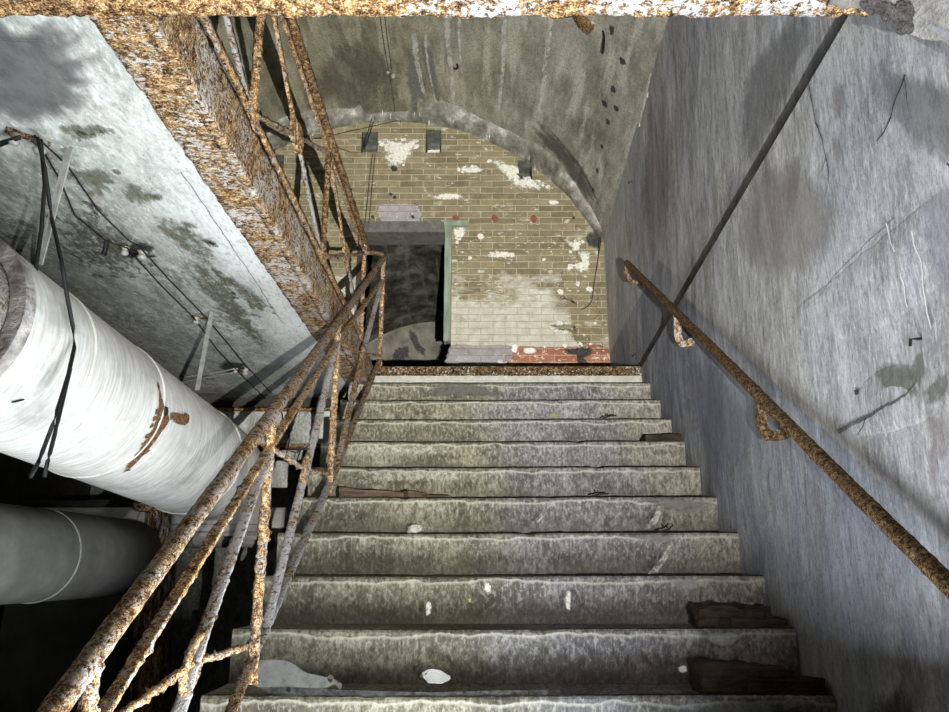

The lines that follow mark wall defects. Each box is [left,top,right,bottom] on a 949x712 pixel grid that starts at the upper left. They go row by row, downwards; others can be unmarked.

spalling [859,0,915,36]
damp [408,33,440,111]
damp [444,17,463,108]
damp [497,16,507,111]
crack [877,75,910,141]
damp [67,170,121,196]
damp [123,185,162,204]
flaking render [258,97,602,237]
damp [125,243,155,259]
damp [157,220,263,345]
peeling [445,233,610,367]
crack [837,383,916,435]